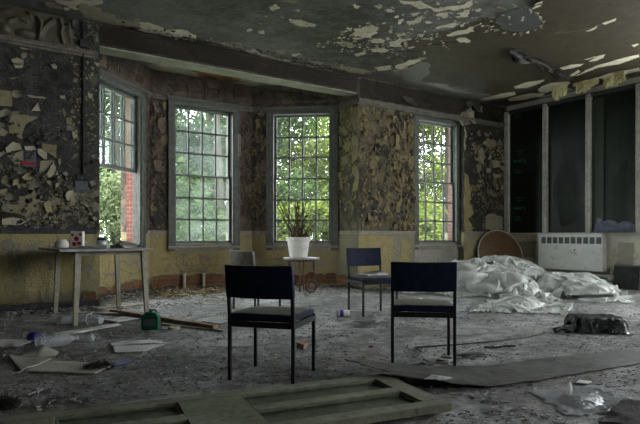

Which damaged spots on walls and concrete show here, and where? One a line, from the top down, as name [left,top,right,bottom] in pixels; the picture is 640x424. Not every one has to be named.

peeling [12,47,41,68]
peeling [45,0,545,75]
peeling [459,48,640,126]
peeling [0,56,100,230]
peeling [149,99,168,228]
peeling [337,106,417,230]
peeling [469,132,504,230]